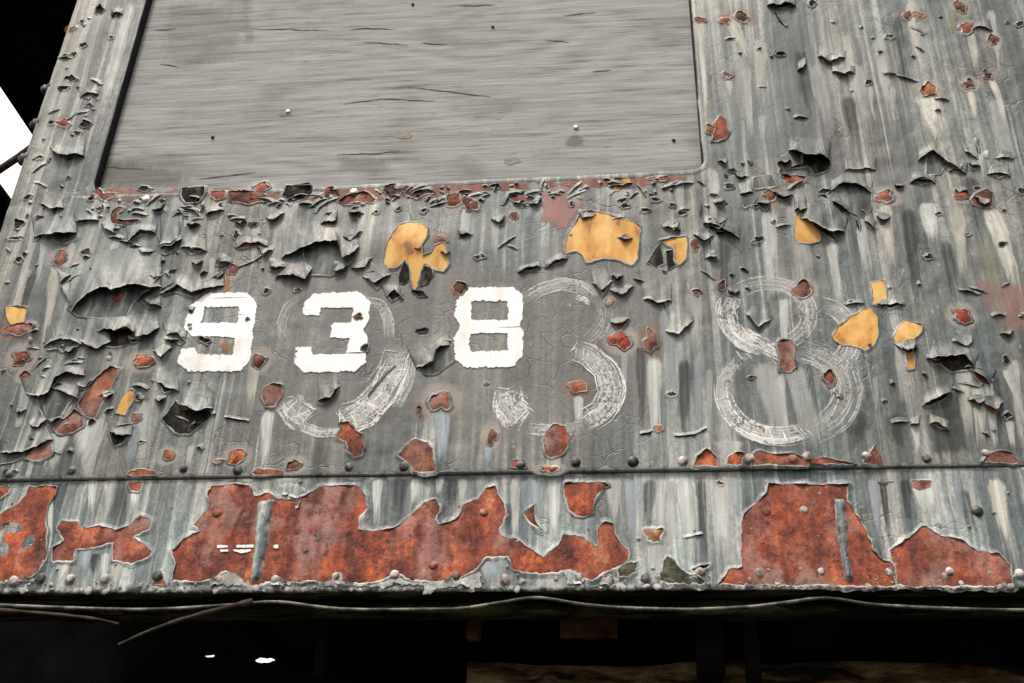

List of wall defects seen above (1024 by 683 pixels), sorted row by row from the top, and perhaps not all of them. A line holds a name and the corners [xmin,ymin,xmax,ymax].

peeling [892,138,1017,209]
peeling [0,42,891,476]
rust [773,337,799,375]
peeling [831,279,1015,436]
rust [0,419,633,591]
rust [690,443,1020,593]